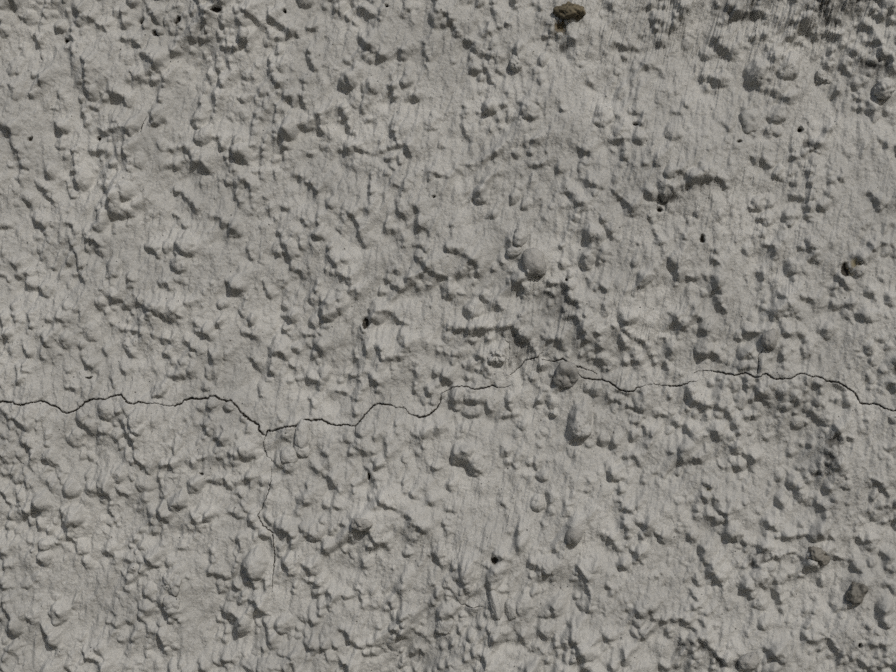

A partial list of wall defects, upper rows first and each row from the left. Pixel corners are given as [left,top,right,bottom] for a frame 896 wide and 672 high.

crack [0,335,896,589]